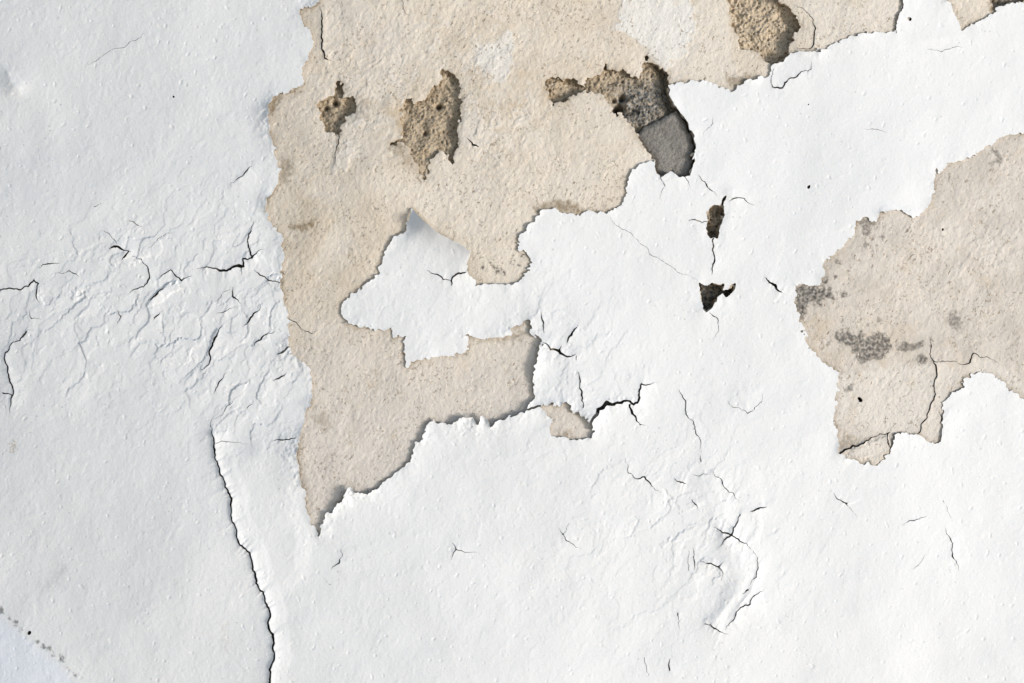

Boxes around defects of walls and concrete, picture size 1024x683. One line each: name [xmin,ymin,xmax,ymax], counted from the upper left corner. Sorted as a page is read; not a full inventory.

crack [0,263,80,410]
crack [104,221,316,683]
peeling [265,0,912,536]
crack [540,310,655,429]
crack [625,391,767,633]
crack [839,432,891,454]
peeling [794,133,1024,466]
crack [917,342,998,434]